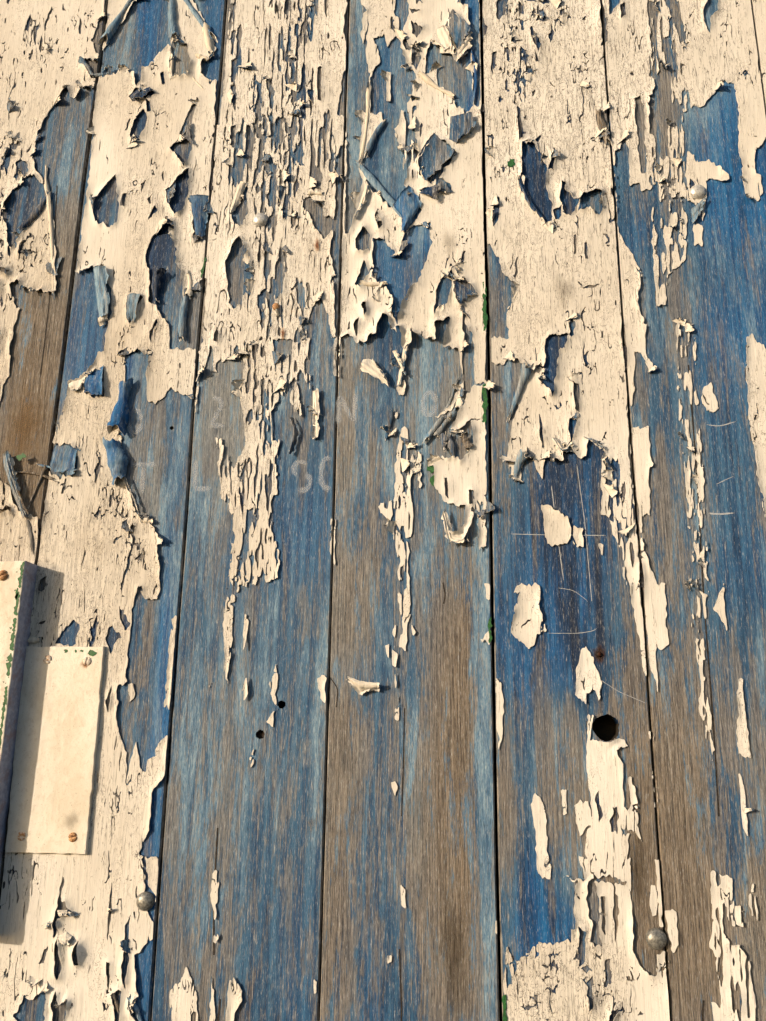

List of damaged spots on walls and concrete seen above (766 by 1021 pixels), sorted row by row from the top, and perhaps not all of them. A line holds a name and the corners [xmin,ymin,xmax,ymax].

peeling [13,877,79,1021]
peeling [0,0,242,554]
peeling [102,0,664,1021]
peeling [614,0,766,1021]